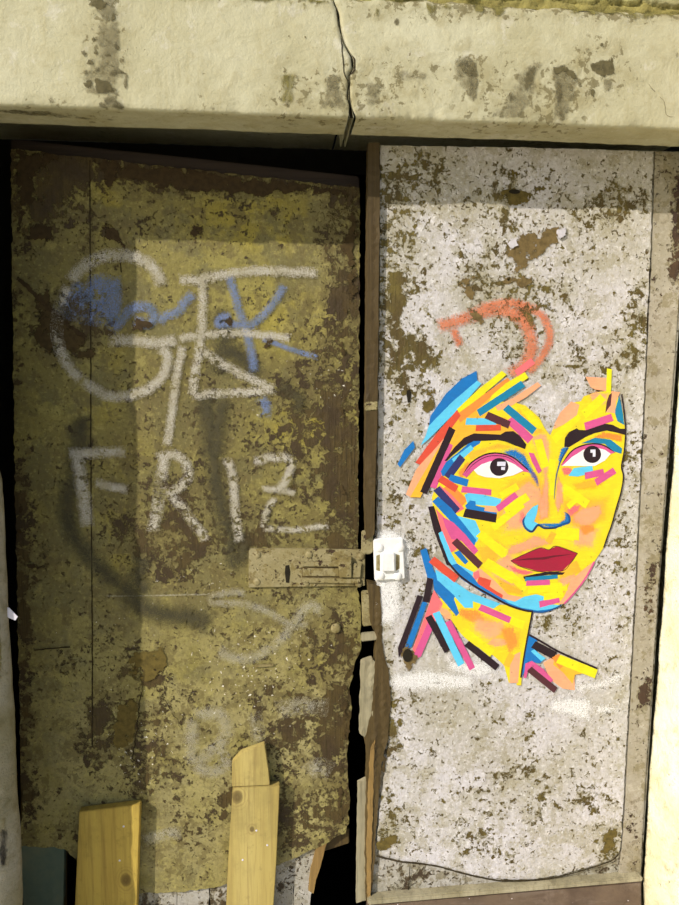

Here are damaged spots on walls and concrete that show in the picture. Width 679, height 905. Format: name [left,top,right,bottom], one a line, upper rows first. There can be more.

spalling [81,0,128,93]
crack [336,9,355,118]
spalling [586,43,615,90]